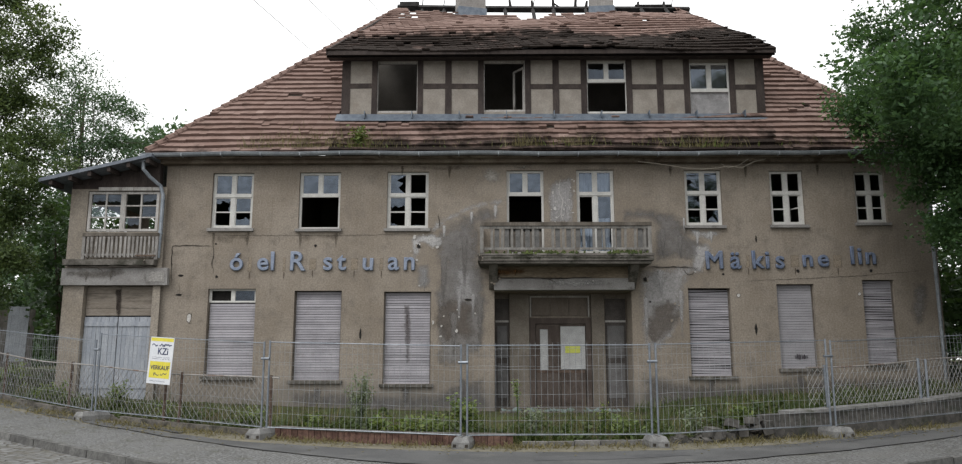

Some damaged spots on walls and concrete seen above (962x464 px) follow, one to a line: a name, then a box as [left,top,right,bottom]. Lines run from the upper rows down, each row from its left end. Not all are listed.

peeling [410,234,442,261]
leakage [433,201,498,363]
peeling [549,179,575,222]
leakage [626,212,717,350]